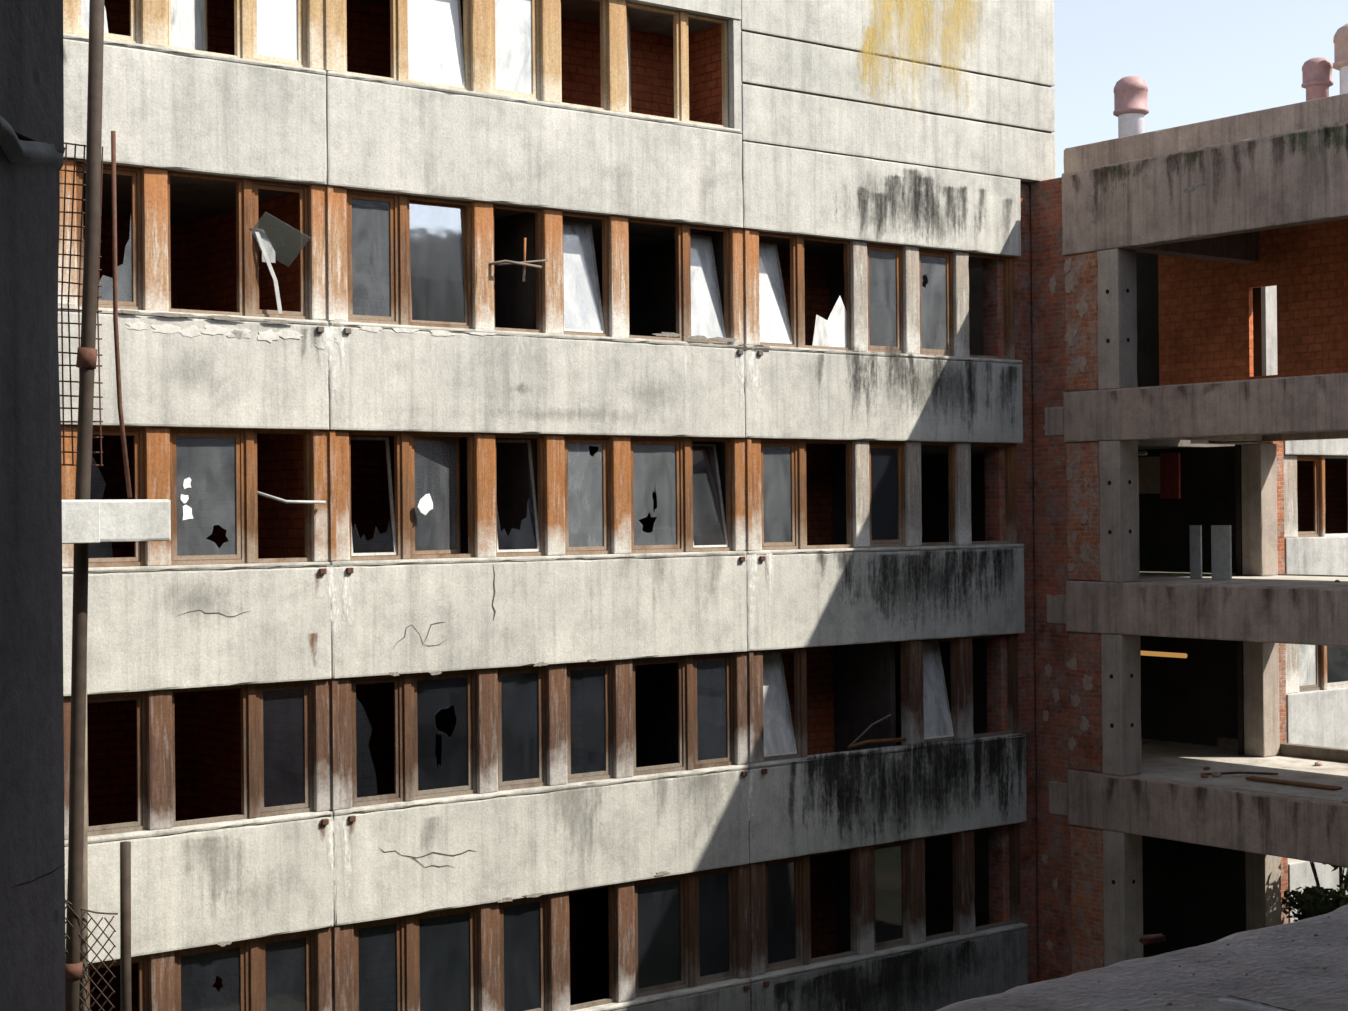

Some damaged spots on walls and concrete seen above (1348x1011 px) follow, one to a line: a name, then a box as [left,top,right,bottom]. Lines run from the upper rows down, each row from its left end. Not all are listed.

water stain [1272,124,1348,152]
water stain [1167,141,1255,172]
water stain [1093,159,1148,192]
water stain [859,170,984,226]
water stain [852,347,1016,405]
water stain [819,551,851,581]
water stain [881,549,1013,604]
crack [392,622,447,650]
water stain [790,734,1032,834]
crack [381,849,477,868]